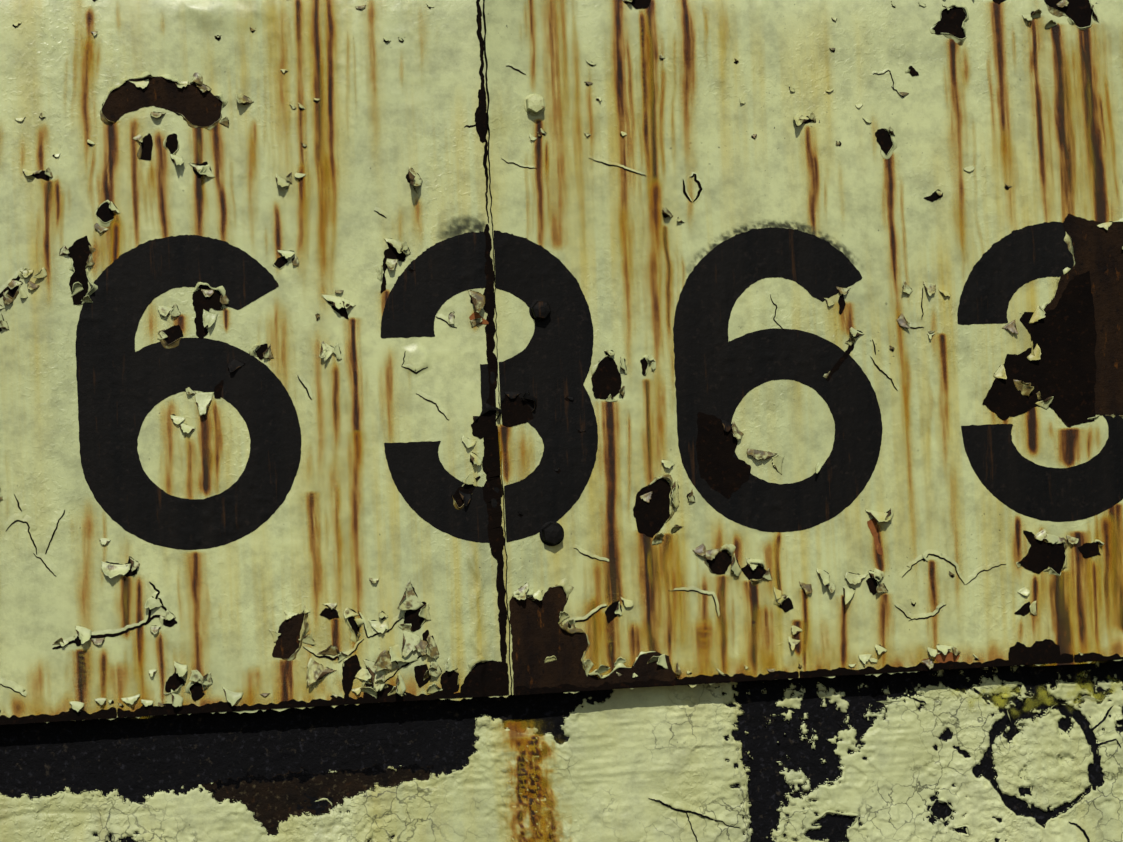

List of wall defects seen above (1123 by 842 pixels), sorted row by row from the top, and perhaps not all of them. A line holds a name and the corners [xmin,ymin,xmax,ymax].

peeling [100,71,254,130]
corrosion [280,0,336,270]
corrosion [613,0,695,362]
corrosion [1029,18,1118,223]
peeling [983,214,1123,427]
corrosion [0,401,1123,725]
crack [895,549,1006,621]
peeling [0,578,692,837]
peeling [715,639,1123,842]
crack [967,684,990,704]
crack [1069,819,1093,842]
crack [1086,703,1123,748]